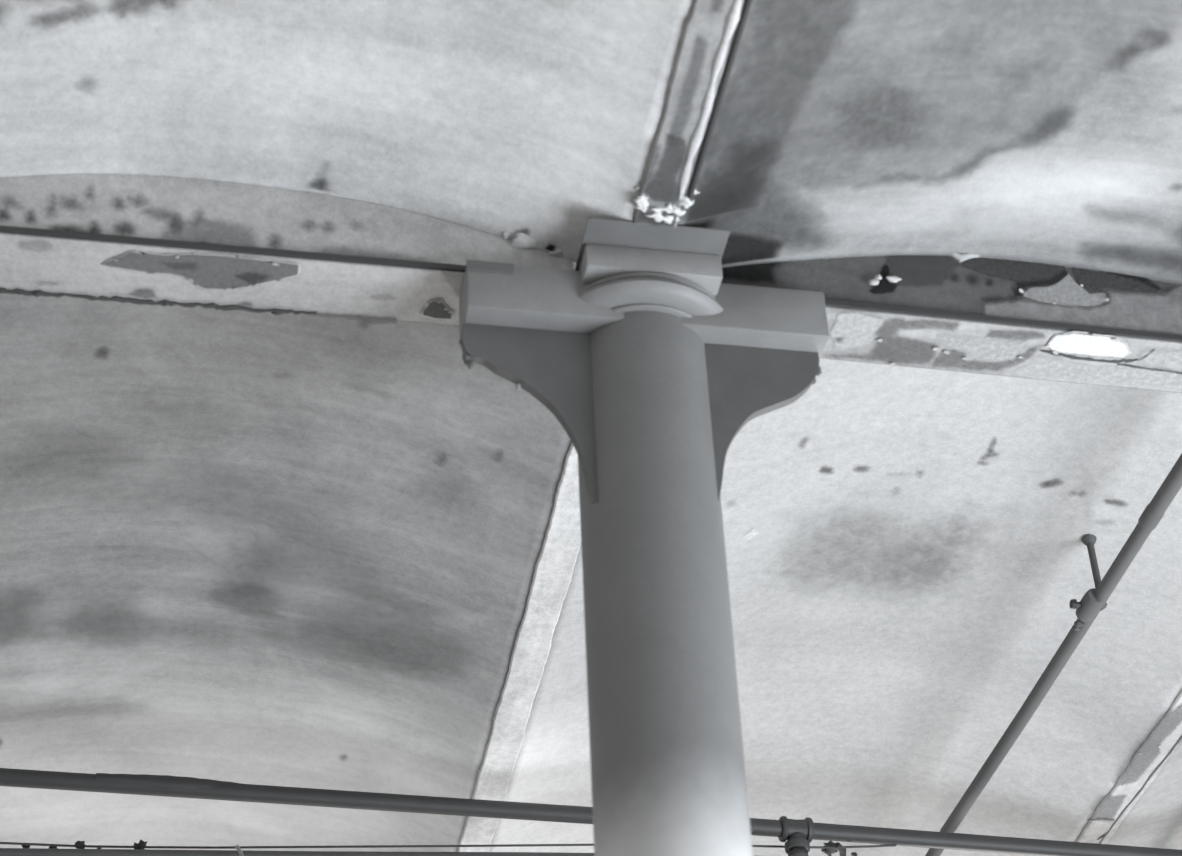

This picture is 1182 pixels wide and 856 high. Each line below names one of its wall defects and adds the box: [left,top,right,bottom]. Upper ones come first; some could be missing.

peeling [633,135,700,224]
peeling [100,250,301,291]
peeling [833,255,1182,370]
peeling [1092,707,1182,821]